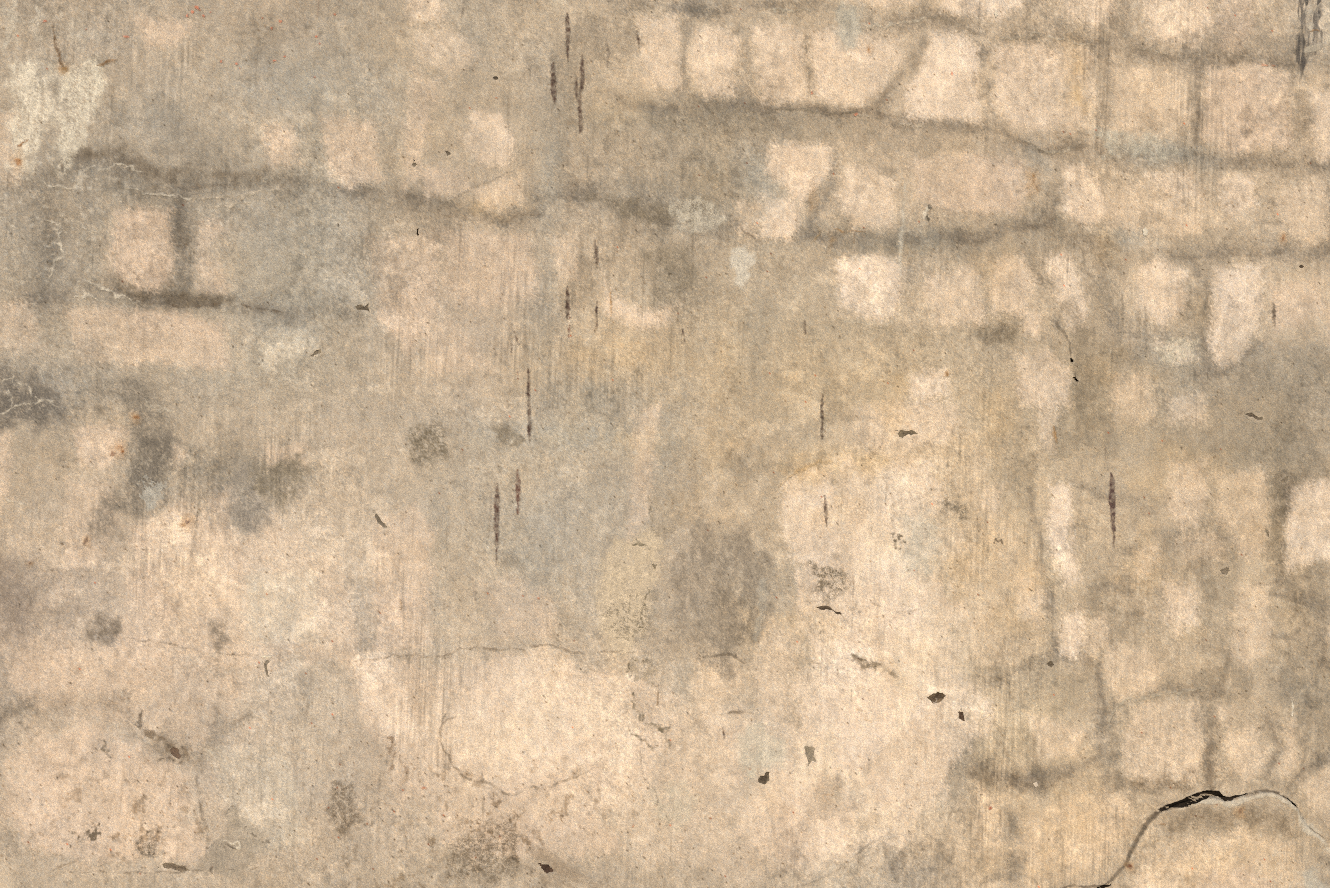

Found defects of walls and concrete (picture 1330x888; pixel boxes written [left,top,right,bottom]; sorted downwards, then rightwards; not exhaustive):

water stain [1292,0,1330,83]
water stain [662,513,783,682]
crack [124,635,260,657]
crack [353,642,676,663]
crack [710,652,746,665]
crack [719,708,755,716]
spalling [922,688,968,725]
spalling [799,741,821,772]
crack [1057,786,1324,888]